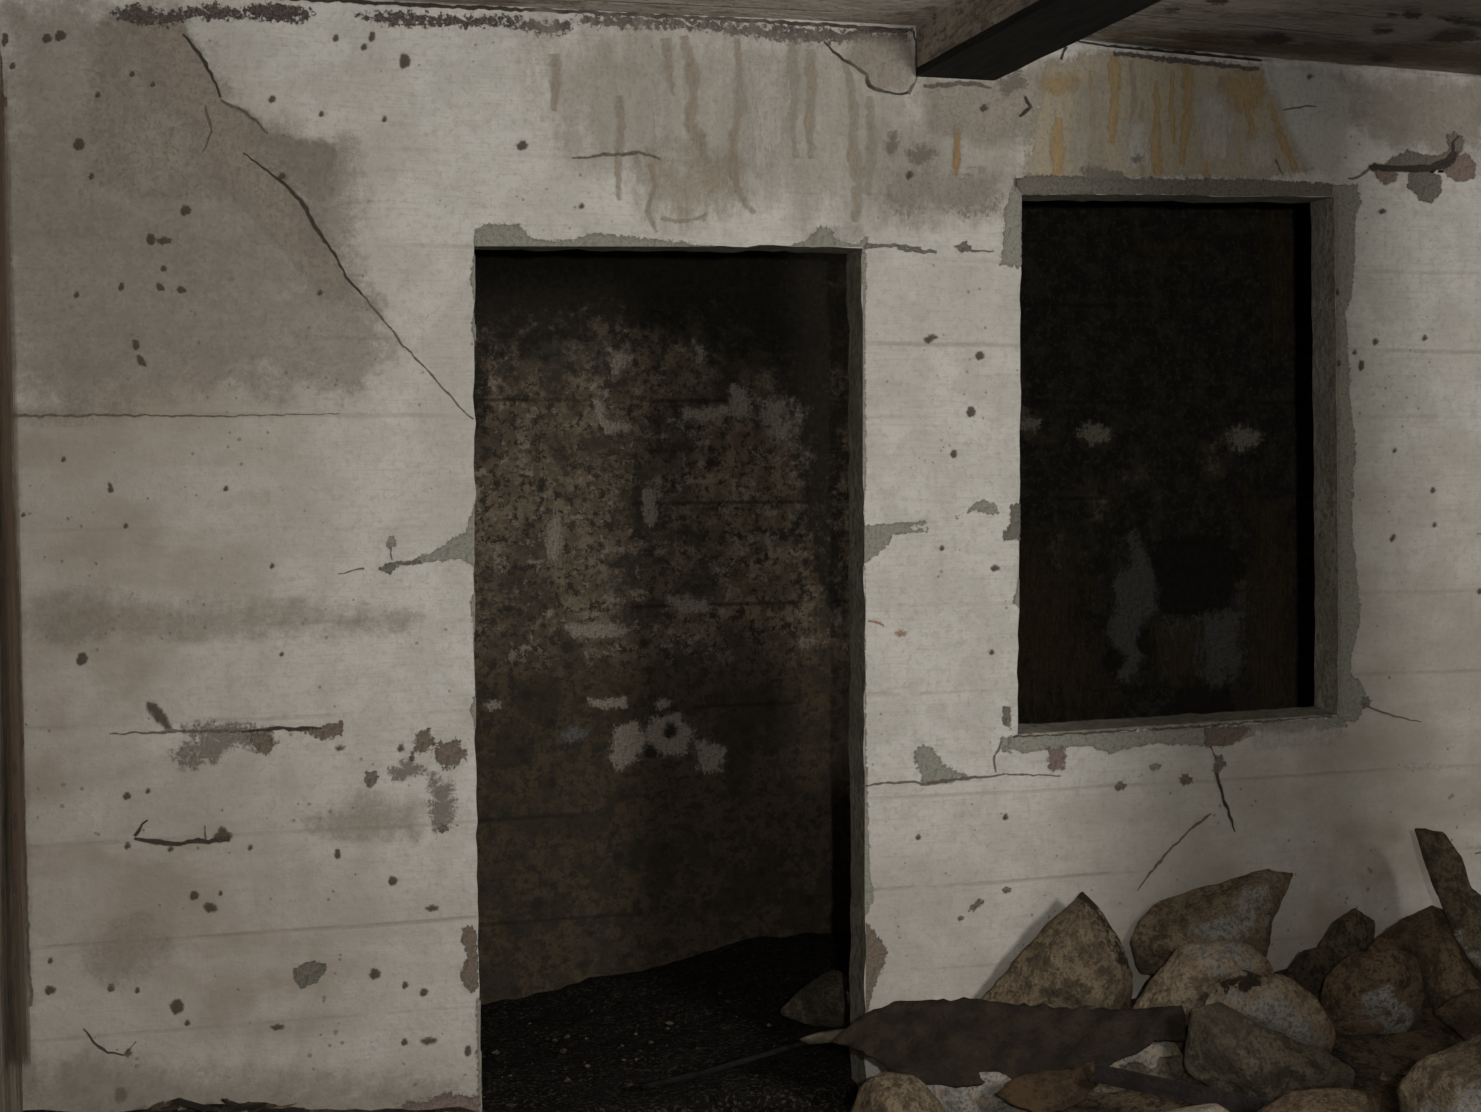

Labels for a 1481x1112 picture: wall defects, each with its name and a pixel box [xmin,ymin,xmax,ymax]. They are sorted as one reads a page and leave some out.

spalling [43,31,65,43]
spalling [1078,41,1262,62]
crack [202,105,213,152]
peeling [74,0,910,295]
damp [572,35,816,225]
corrosion [1024,50,1313,179]
crack [243,153,474,419]
spalling [470,223,714,341]
spalling [338,504,475,575]
spalling [788,166,1421,1013]
spalling [110,702,346,772]
spalling [364,728,468,834]